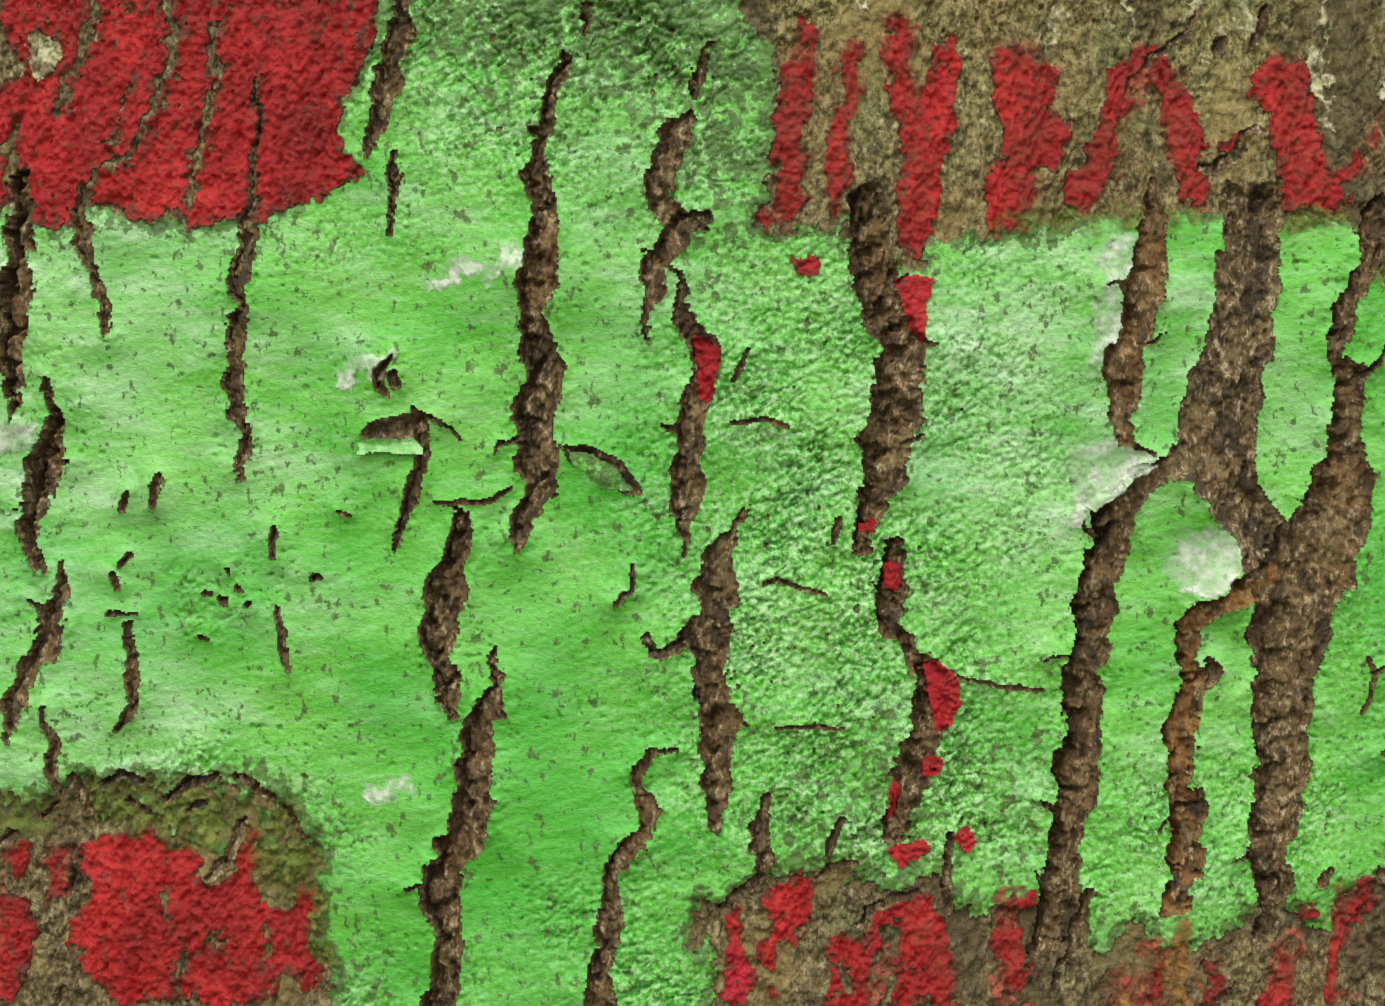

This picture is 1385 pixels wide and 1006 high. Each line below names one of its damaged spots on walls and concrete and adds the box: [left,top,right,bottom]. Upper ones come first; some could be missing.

spalling [24,31,63,82]
crack [220,80,263,481]
peeling [755,14,963,260]
crack [0,169,310,900]
crack [392,2,593,1006]
crack [585,41,845,1006]
crack [815,177,1169,993]
crack [1157,192,1385,946]
peeling [0,839,70,1003]
peeling [93,783,227,840]
peeling [718,868,814,1006]
peeling [822,894,962,1006]